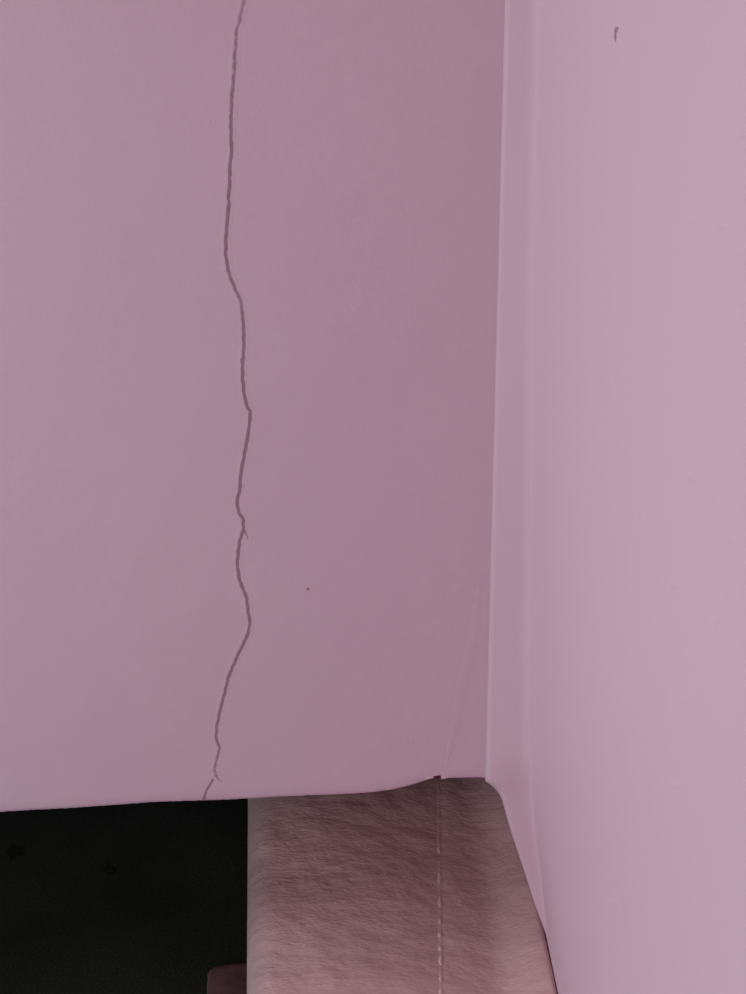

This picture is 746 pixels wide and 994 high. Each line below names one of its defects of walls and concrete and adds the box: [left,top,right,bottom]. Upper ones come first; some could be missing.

crack [203,0,256,801]